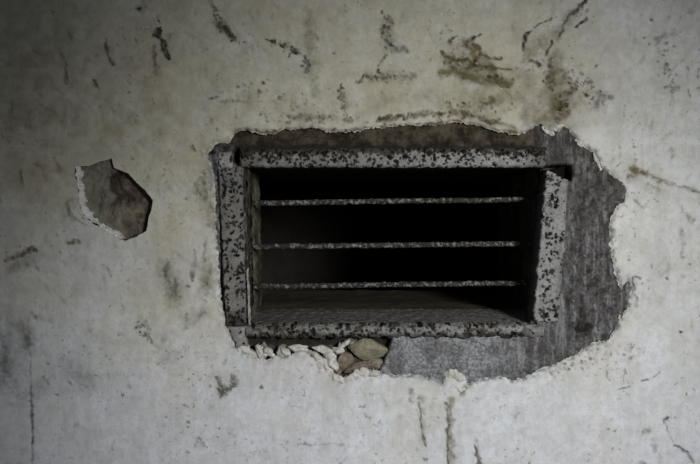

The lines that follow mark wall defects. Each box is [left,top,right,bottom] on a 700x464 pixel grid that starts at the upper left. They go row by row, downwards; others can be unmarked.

spalling [75,159,153,241]
spalling [208,120,632,392]